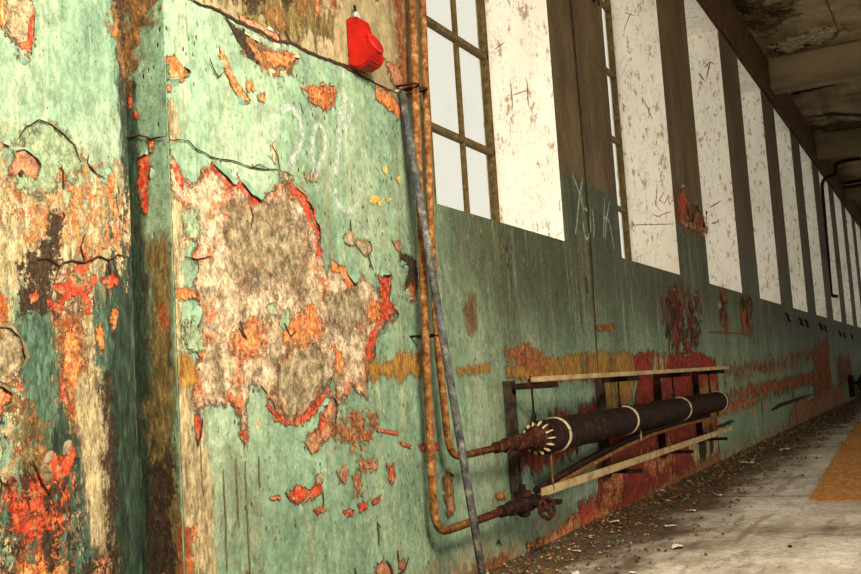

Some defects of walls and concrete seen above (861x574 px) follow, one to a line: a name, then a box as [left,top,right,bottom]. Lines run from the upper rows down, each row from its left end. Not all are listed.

peeling [0,0,40,66]
peeling [231,14,337,111]
crack [193,0,398,93]
leakage [732,0,805,57]
crack [18,119,105,178]
crack [127,134,293,176]
peeling [166,46,419,457]
peeling [0,135,155,514]
peeling [634,281,719,405]
peeling [270,473,327,517]
peeling [337,452,396,521]
peeling [520,412,720,515]